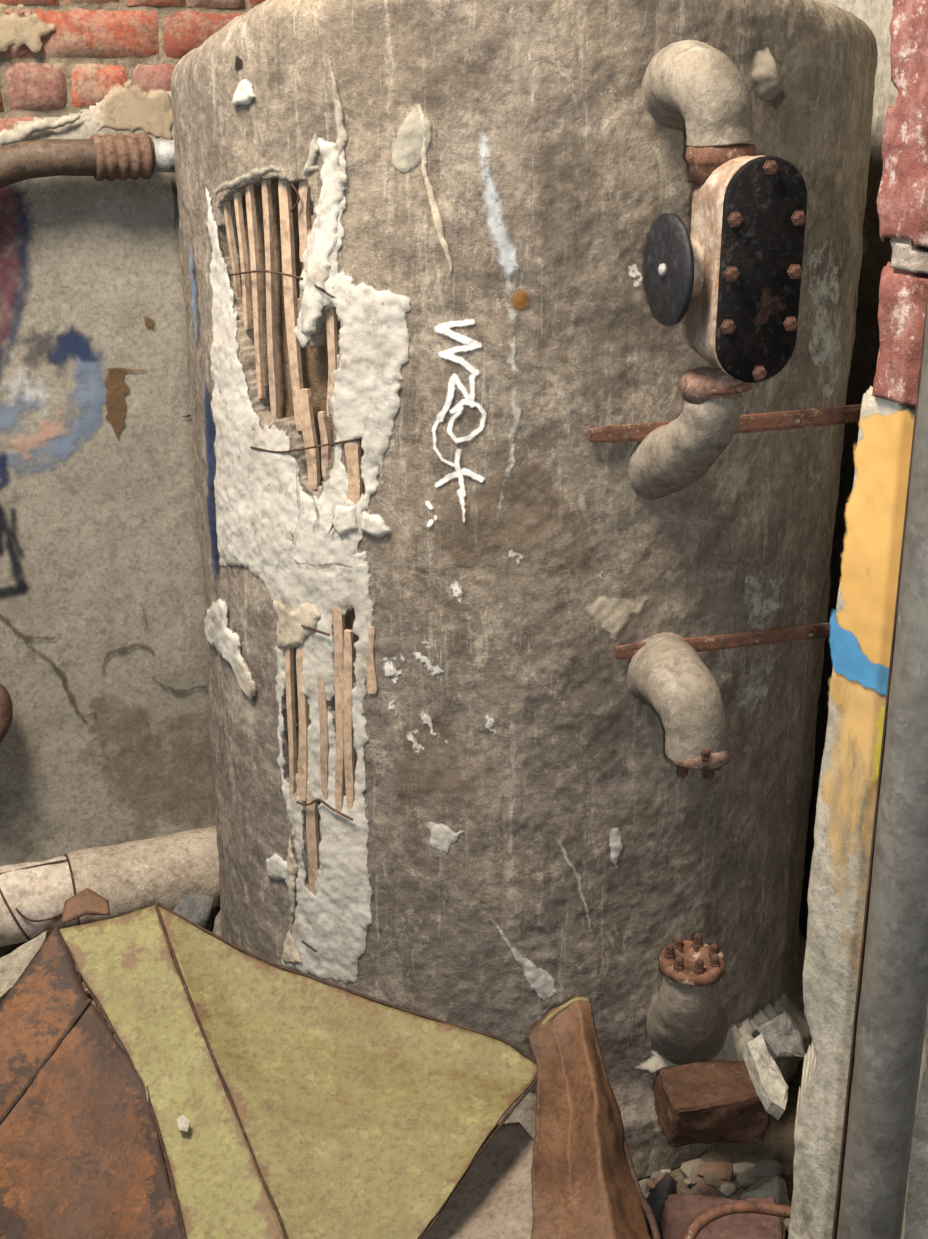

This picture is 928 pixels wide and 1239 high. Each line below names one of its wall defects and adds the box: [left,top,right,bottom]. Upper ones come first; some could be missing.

peeling [0,4,55,53]
peeling [0,79,173,146]
peeling [391,104,452,272]
peeling [204,56,411,983]
peeling [586,592,648,640]
crack [0,614,95,723]
crack [103,643,208,694]
peeling [425,821,464,853]